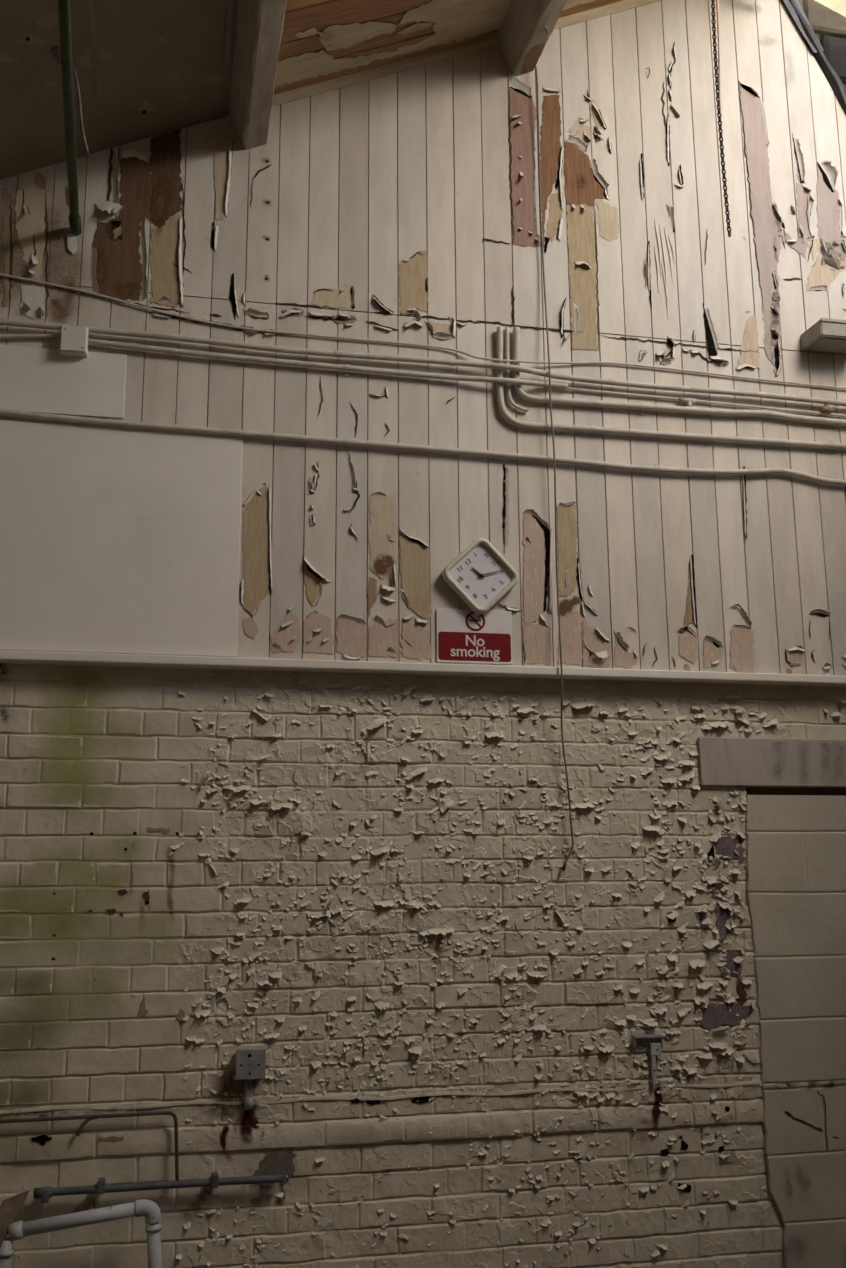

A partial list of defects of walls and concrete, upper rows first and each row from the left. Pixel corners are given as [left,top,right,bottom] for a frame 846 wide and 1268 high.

peeling [274,0,511,88]
peeling [2,171,60,320]
peeling [92,128,192,307]
peeling [508,75,620,350]
peeling [639,80,846,377]
peeling [239,483,330,653]
peeling [308,461,320,526]
peeling [336,491,432,660]
peeling [498,467,755,672]
corrosion [220,1106,263,1158]
corrosion [649,1085,662,1125]